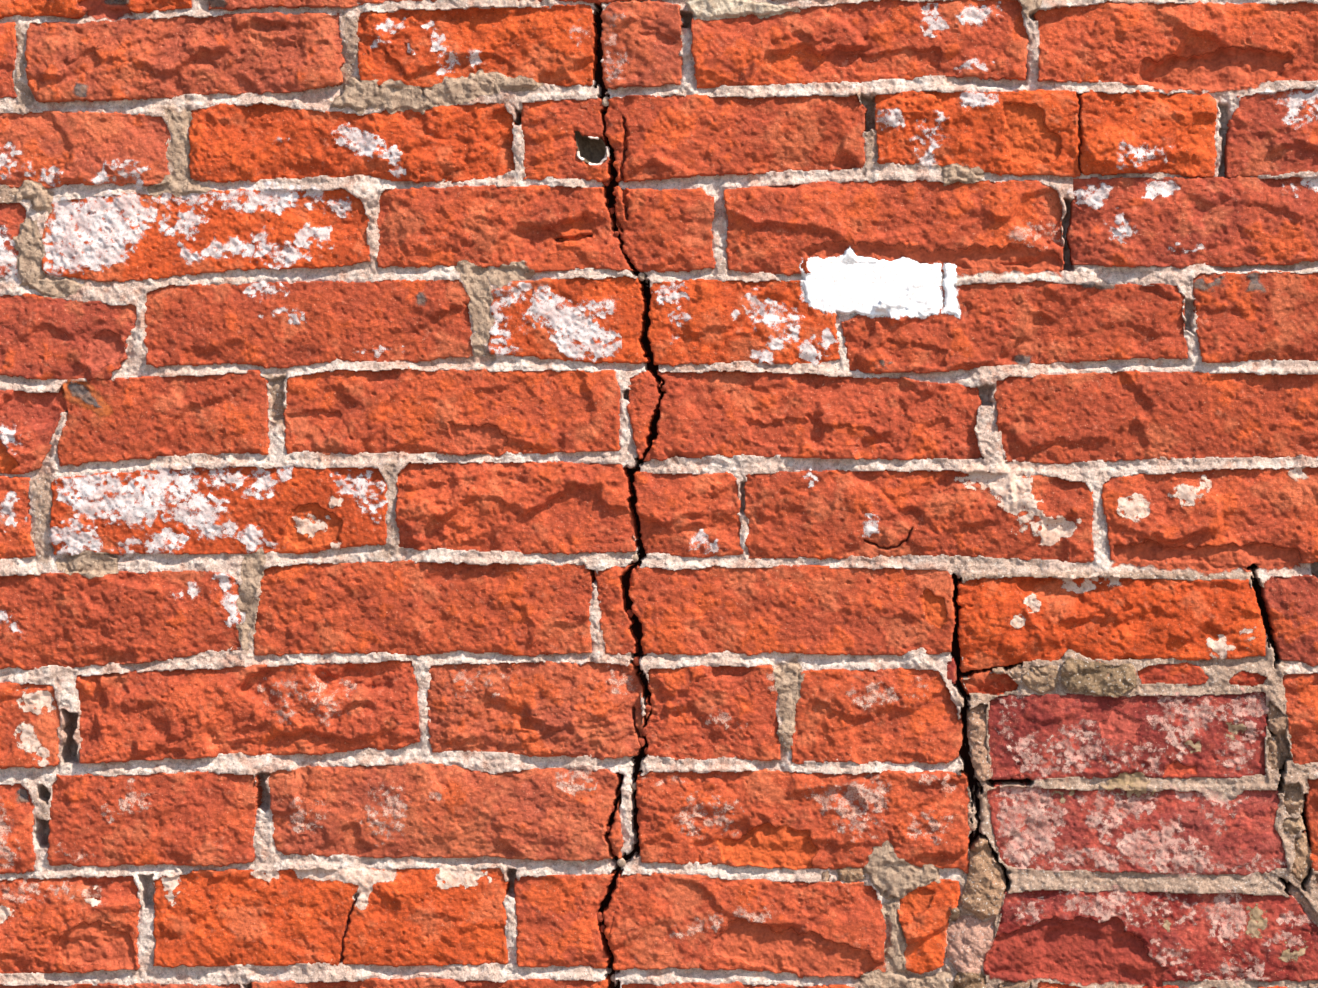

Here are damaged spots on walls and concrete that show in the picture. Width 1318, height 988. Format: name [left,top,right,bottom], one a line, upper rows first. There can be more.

crack [555,8,665,988]
crack [951,574,1028,882]
efflorescence [995,687,1313,986]